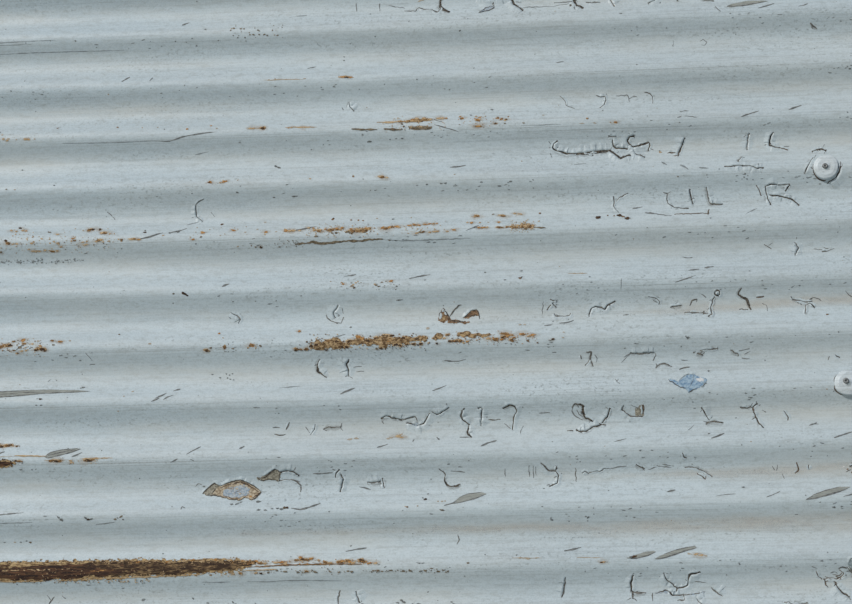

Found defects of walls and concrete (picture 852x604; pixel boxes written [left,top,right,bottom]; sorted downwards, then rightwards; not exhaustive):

crack [475,0,621,14]
rust [352,117,447,131]
crack [549,110,694,164]
crack [724,131,847,208]
rust [220,222,470,248]
crack [648,288,768,317]
rust [293,324,538,352]
peeling [668,371,707,392]
crack [379,400,522,438]
rust [0,443,107,468]
peeling [202,465,288,511]
rust [0,556,449,593]